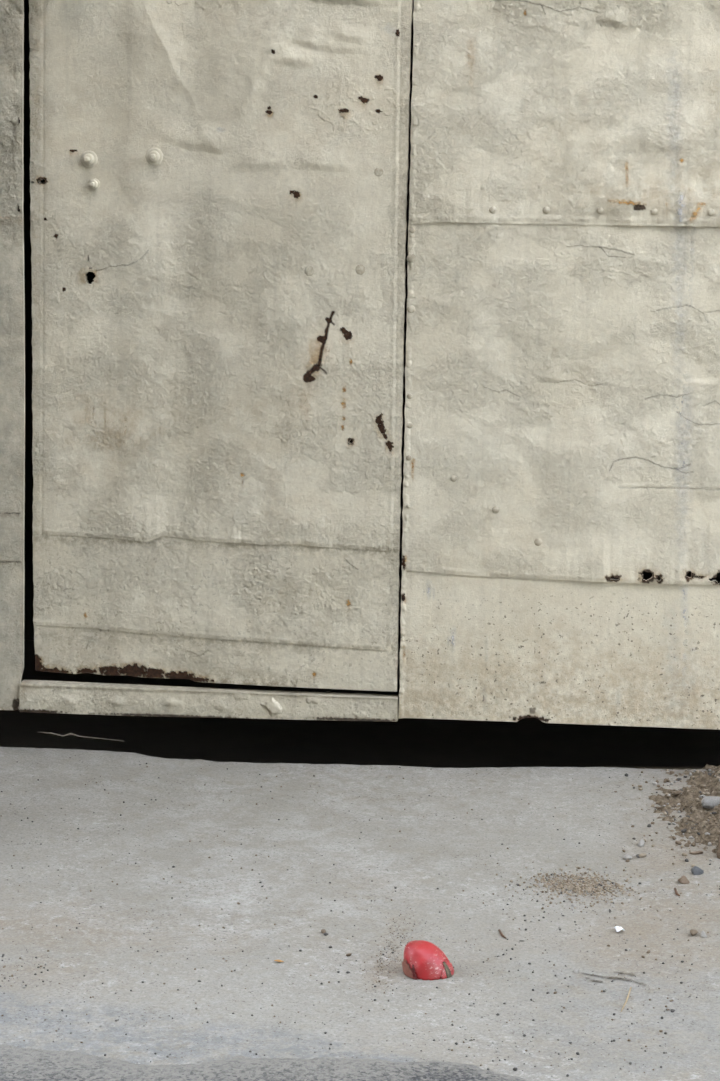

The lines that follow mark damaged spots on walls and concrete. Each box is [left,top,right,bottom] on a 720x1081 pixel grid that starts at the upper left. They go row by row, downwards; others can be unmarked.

rust [303,311,352,382]
rust [375,413,394,452]
rust [35,654,214,682]